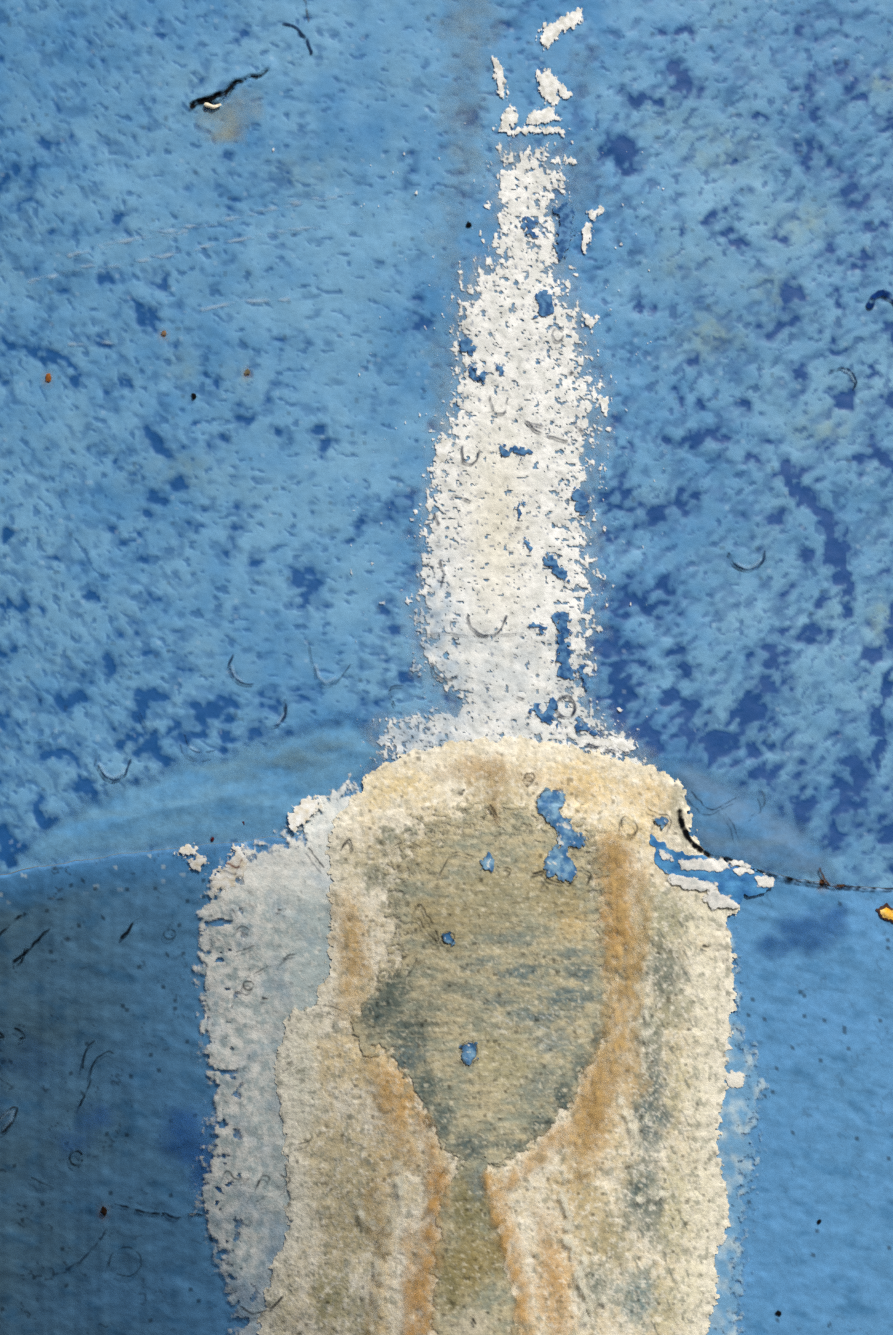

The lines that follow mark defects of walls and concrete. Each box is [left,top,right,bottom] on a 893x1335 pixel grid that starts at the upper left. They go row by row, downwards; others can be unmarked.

peeling [536,7,583,50]
crack [190,70,268,109]
spalling [174,56,776,1335]
crack [677,791,893,890]
peeling [876,903,893,923]
corrosion [407,1172,442,1335]